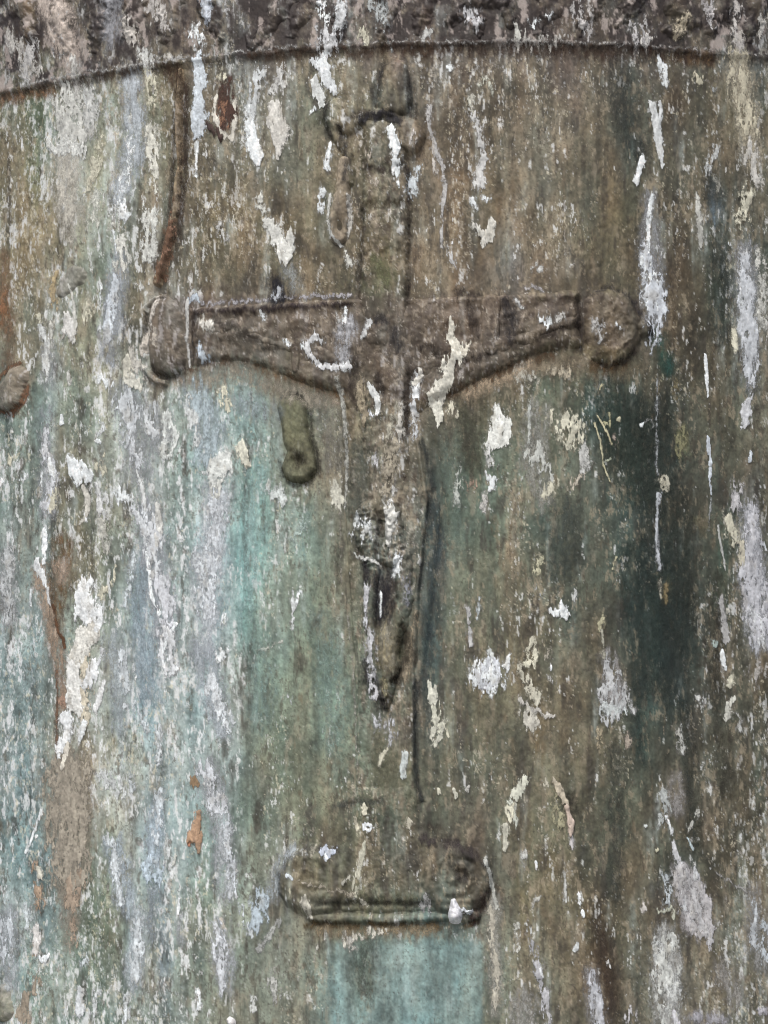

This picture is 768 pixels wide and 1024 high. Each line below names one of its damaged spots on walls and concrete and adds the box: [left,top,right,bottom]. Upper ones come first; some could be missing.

rust [205,67,238,143]
rust [153,181,187,284]
leakage [456,288,480,339]
leakage [460,60,743,1024]
peeling [468,648,510,698]
leakage [715,871,768,973]